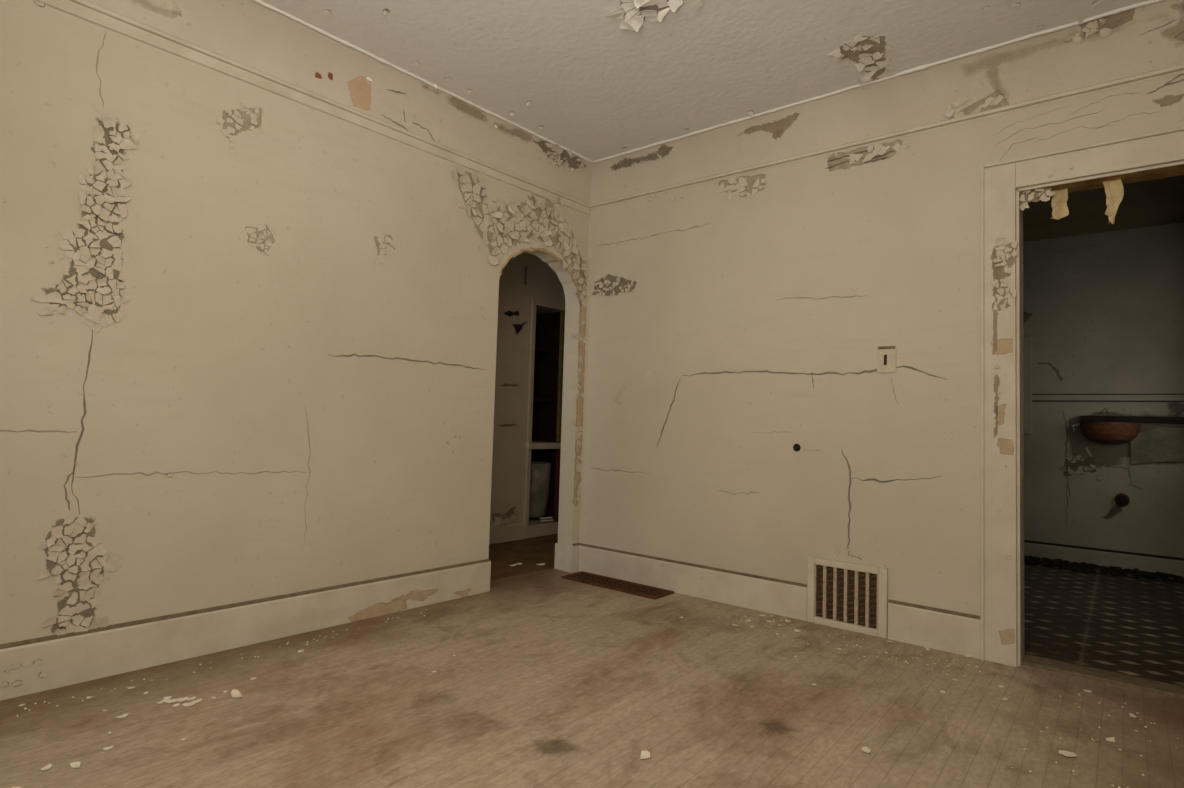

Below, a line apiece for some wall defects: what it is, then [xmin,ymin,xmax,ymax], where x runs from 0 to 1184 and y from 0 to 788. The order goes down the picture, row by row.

peeling [604,0,704,32]
peeling [826,35,896,85]
peeling [217,102,262,149]
peeling [821,140,909,171]
peeling [31,104,139,333]
peeling [718,174,767,200]
peeling [1103,179,1124,224]
peeling [991,237,1033,324]
peeling [451,163,636,506]
peeling [33,515,118,636]